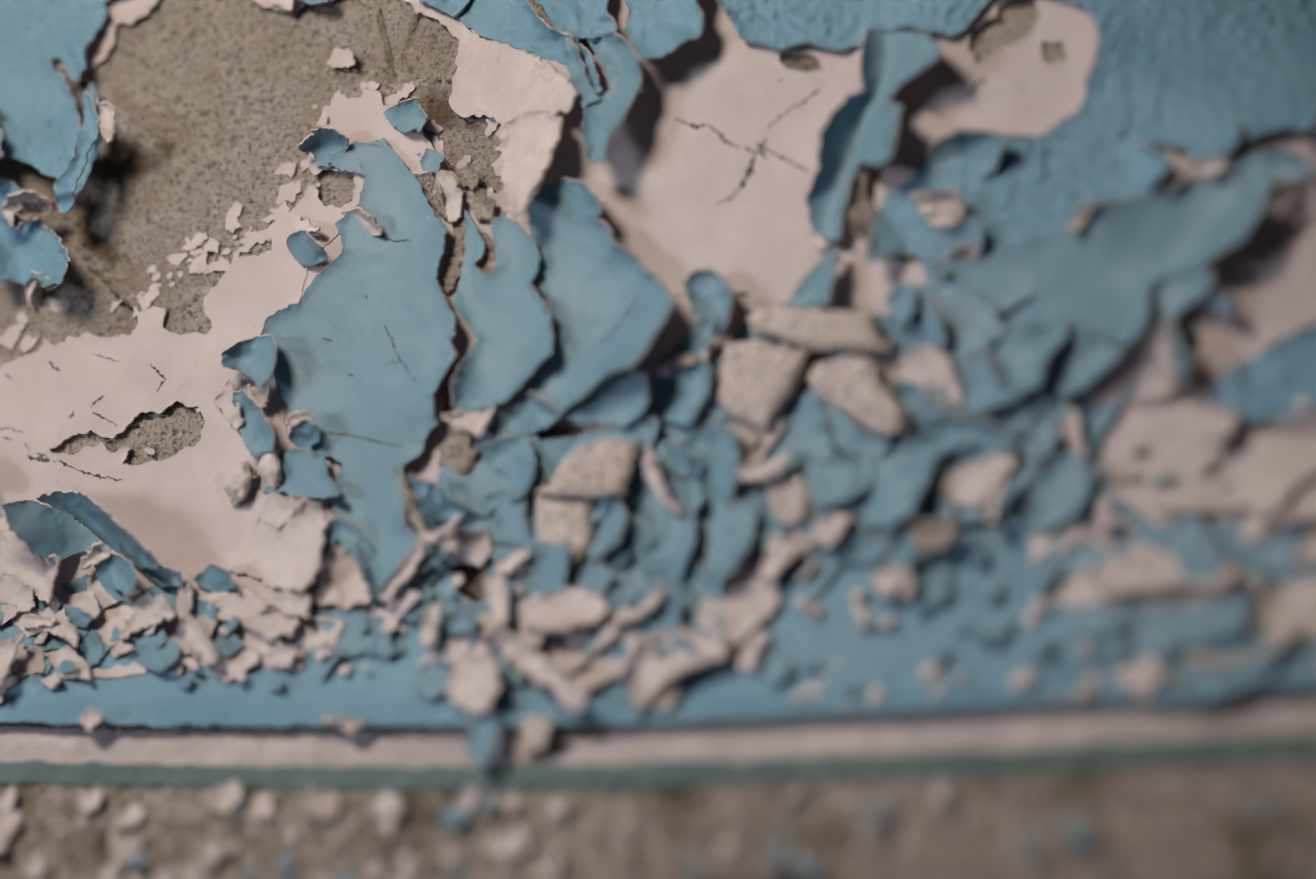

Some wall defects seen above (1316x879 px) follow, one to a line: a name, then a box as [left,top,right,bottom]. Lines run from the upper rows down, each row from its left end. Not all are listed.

crack [676,77,820,205]
flaking render [0,0,1099,710]
peeling [910,105,1316,565]
peeling [79,706,103,731]
peeling [323,715,365,735]
peeling [411,542,635,770]
peeling [1023,497,1316,709]